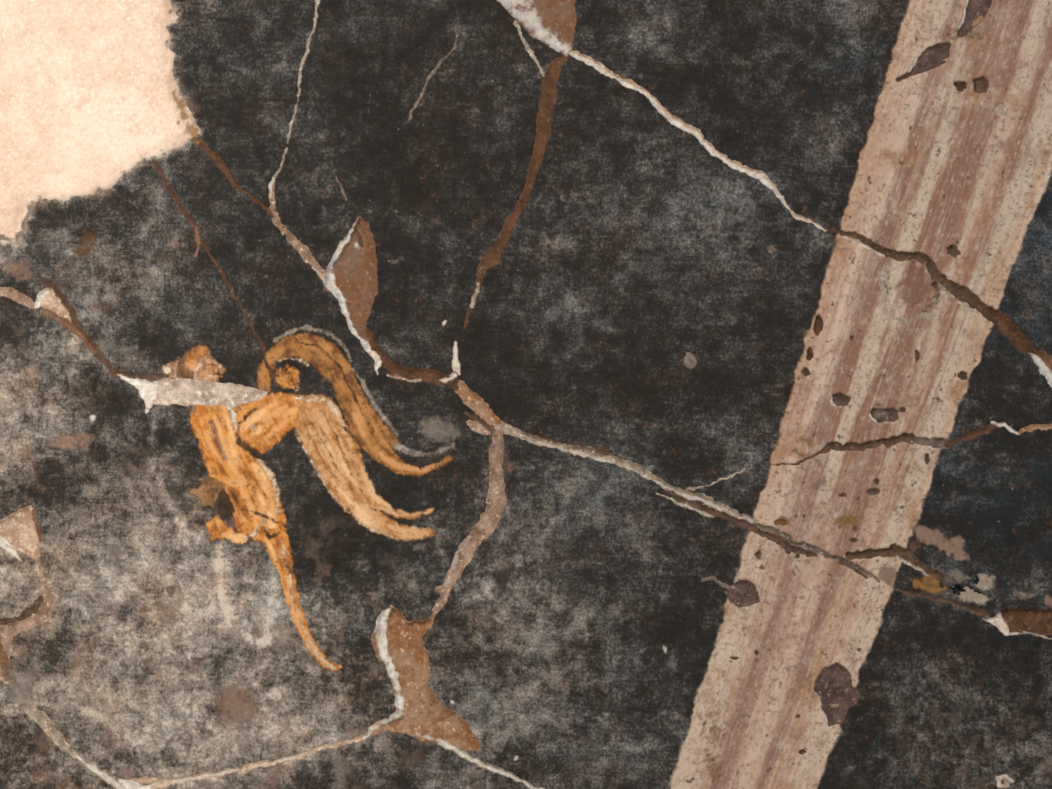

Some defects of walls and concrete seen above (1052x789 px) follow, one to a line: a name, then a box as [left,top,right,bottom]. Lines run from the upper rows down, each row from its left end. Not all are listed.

flaking render [0,0,200,243]
crack [193,0,326,283]
crack [408,22,459,121]
spalling [497,0,577,76]
crack [0,280,169,382]
spalling [323,216,398,375]
crack [366,50,1052,619]
spalling [0,506,56,683]
crack [8,677,367,789]
spalling [364,605,482,751]
crack [437,742,547,789]
spalling [814,663,861,726]